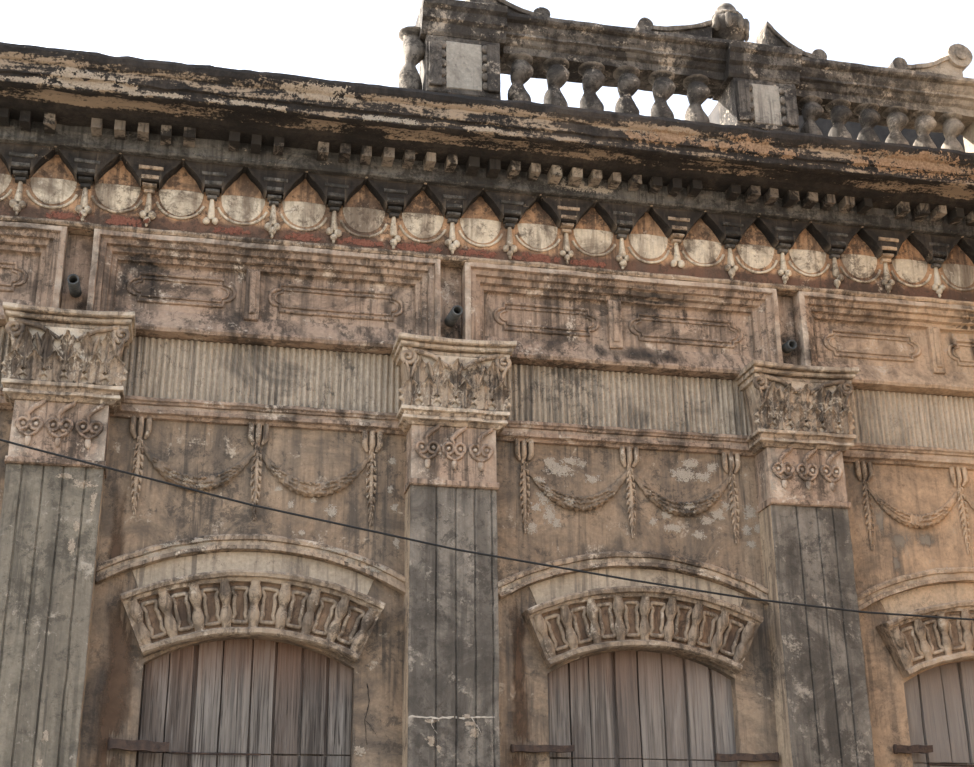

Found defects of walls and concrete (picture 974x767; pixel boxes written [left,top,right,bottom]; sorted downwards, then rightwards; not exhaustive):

peeling [0,66,190,99]
peeling [206,80,360,113]
peeling [362,115,420,125]
peeling [463,126,517,136]
peeling [624,127,799,160]
peeling [550,167,613,195]
peeling [847,148,974,184]